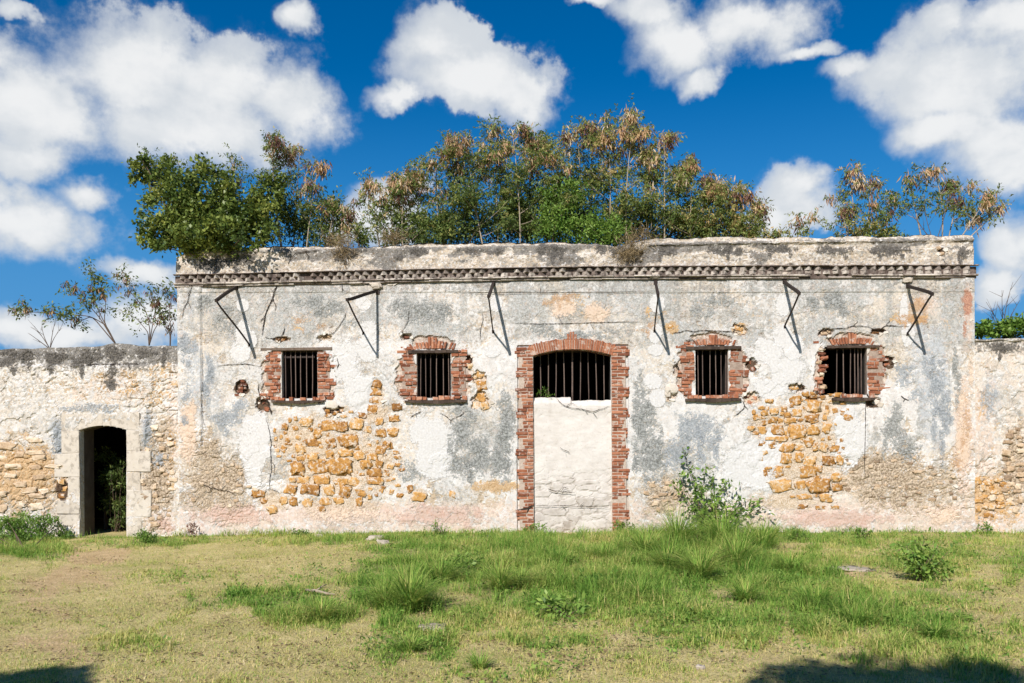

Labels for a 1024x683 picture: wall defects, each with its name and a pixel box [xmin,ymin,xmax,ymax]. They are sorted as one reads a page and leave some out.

crack [260,285,285,340]
spalling [0,430,68,523]
leakage [0,333,250,469]
crack [201,354,279,493]
spalling [137,378,430,536]
leakage [396,459,425,483]
leakage [446,389,516,485]
leakage [629,373,728,484]
spalling [737,329,1024,527]
leakage [880,346,998,475]